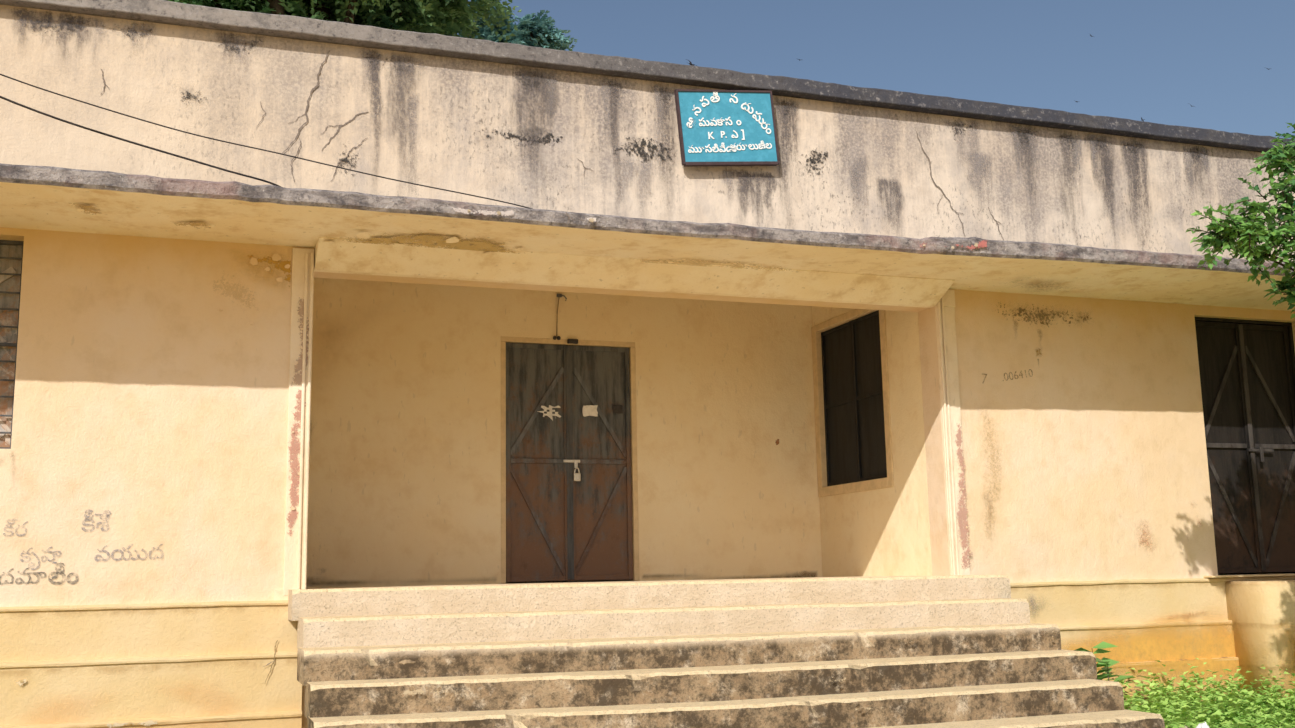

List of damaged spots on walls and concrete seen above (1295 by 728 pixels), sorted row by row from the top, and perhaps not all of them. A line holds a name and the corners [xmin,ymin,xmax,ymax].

damp [14,9,102,42]
crack [256,51,369,182]
damp [364,51,416,146]
damp [475,70,563,156]
damp [603,79,675,185]
damp [724,101,828,211]
damp [854,161,901,217]
crack [916,131,1004,240]
damp [1060,135,1149,219]
damp [998,303,1091,327]